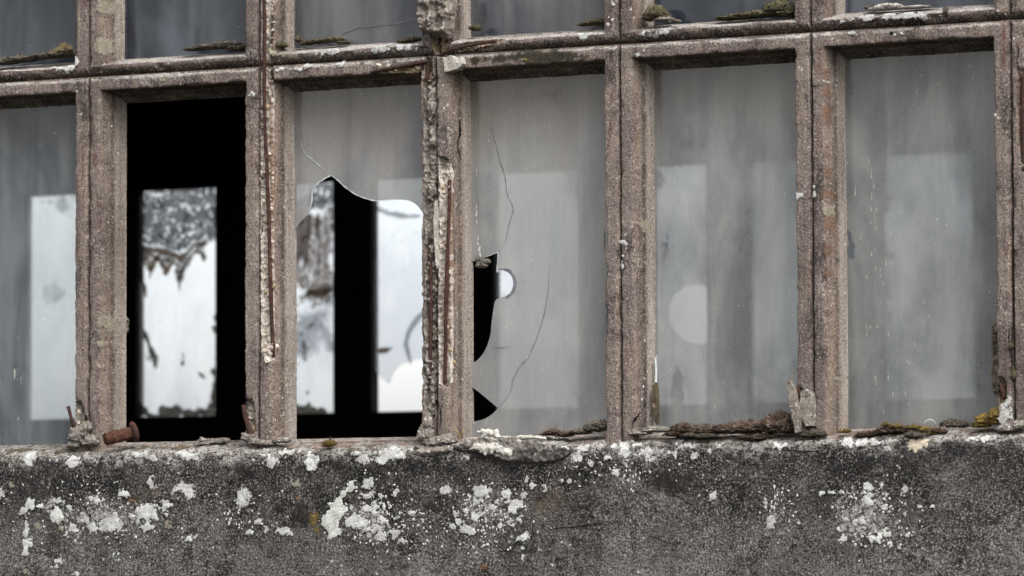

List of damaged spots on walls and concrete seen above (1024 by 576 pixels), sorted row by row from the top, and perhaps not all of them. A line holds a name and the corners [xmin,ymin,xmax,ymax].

spalling [370,38,498,420]